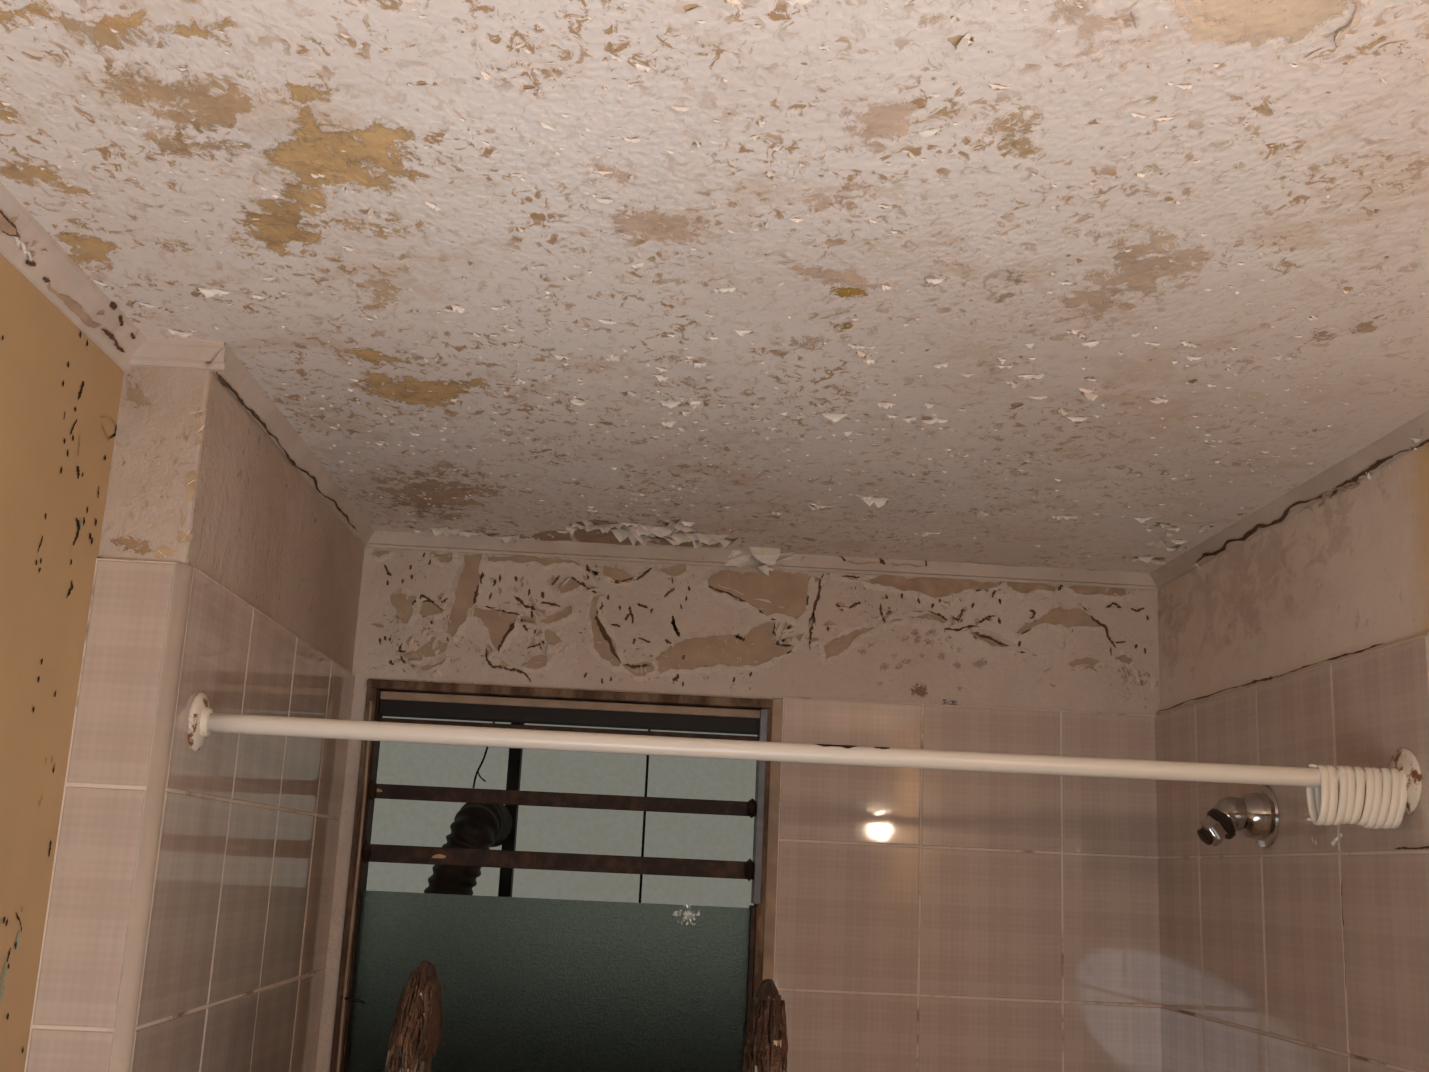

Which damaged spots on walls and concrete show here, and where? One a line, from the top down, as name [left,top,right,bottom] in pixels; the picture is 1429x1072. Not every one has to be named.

peeling [683,4,706,24]
peeling [947,15,993,57]
peeling [0,211,125,353]
peeling [191,287,234,306]
peeling [60,362,84,479]
crack [216,372,357,531]
peeling [618,367,728,432]
peeling [794,395,966,436]
peeling [996,324,1047,411]
peeling [1056,329,1101,423]
crack [1195,440,1429,563]
flaking render [368,493,1149,687]